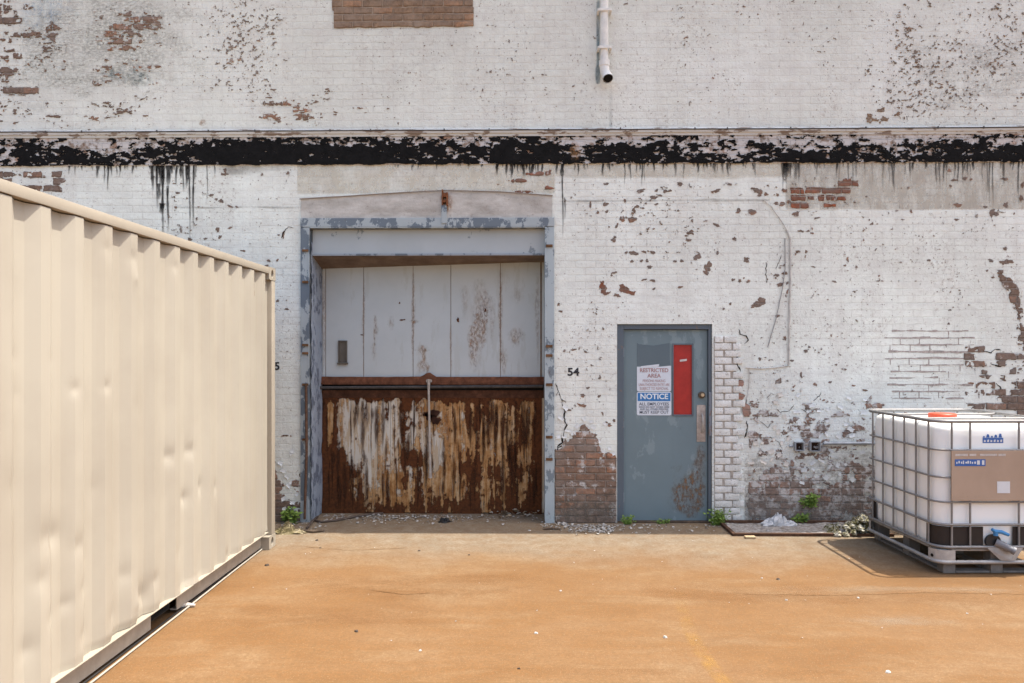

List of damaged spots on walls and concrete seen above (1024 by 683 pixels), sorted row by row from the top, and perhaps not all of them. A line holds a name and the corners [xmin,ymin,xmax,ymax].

peeling [0,0,337,131]
peeling [857,0,1024,124]
water stain [148,165,215,216]
water stain [779,162,1024,209]
spalling [555,177,938,523]
peeling [738,182,1024,520]
peeling [275,435,300,521]
corrosion [322,398,542,514]
crack [556,385,568,450]